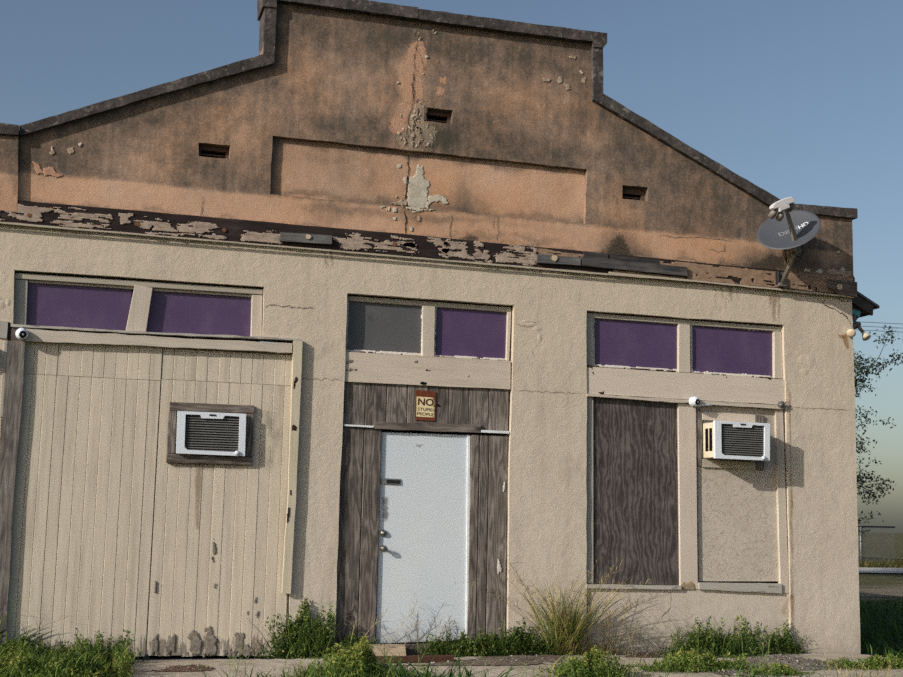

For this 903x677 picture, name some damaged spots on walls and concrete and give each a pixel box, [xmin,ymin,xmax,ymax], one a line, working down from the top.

peeling [389,37,438,148]
crack [406,32,424,133]
peeling [33,161,63,178]
peeling [0,204,227,240]
peeling [240,230,283,244]
peeling [333,164,449,256]
crack [403,155,411,234]
peeling [427,237,584,267]
leakage [607,237,632,256]
peeling [613,261,854,293]
peeling [186,626,268,658]